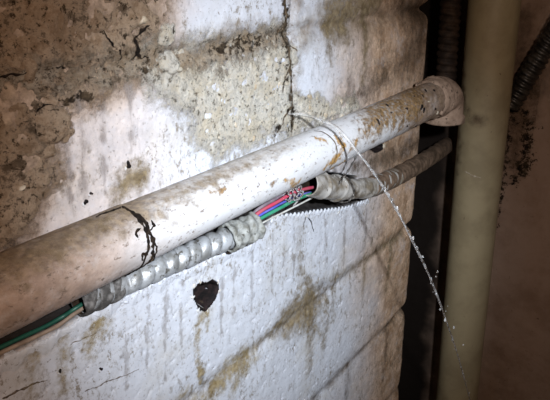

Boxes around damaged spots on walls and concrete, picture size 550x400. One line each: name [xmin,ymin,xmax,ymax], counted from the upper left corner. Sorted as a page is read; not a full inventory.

crack [103,25,150,60]
crack [275,0,297,130]
flaking render [0,0,369,251]
water stain [498,103,543,217]
flaking render [0,242,257,378]
water stain [274,288,327,339]
water stain [202,349,249,398]